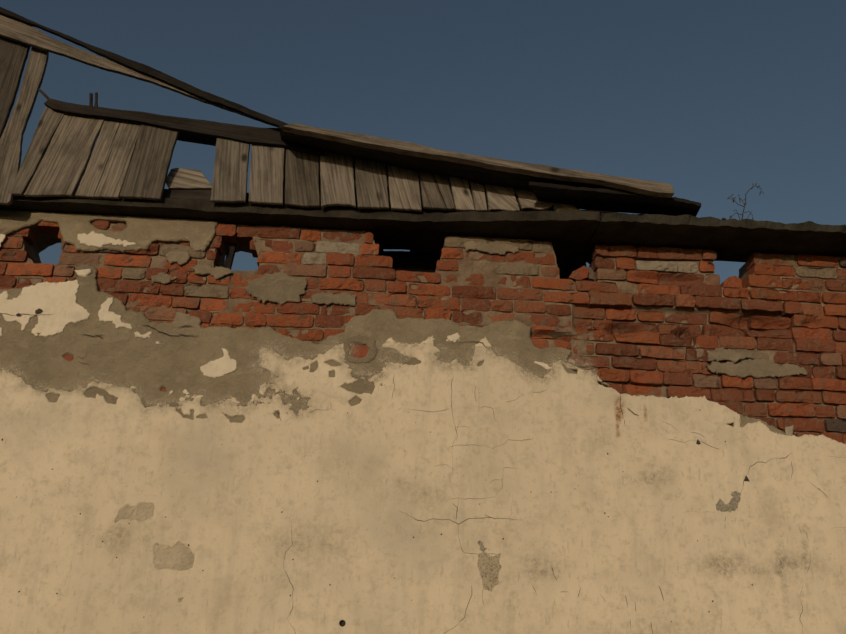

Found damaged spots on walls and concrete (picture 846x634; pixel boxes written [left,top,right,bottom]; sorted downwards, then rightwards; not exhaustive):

flaking render [0,210,219,254]
flaking render [0,275,577,423]
crack [410,377,534,472]
flaking render [732,414,798,437]
flaking render [115,503,155,524]
crack [400,467,518,554]
flaking render [716,491,741,512]
flaking render [154,542,195,571]
flaking render [478,540,502,591]